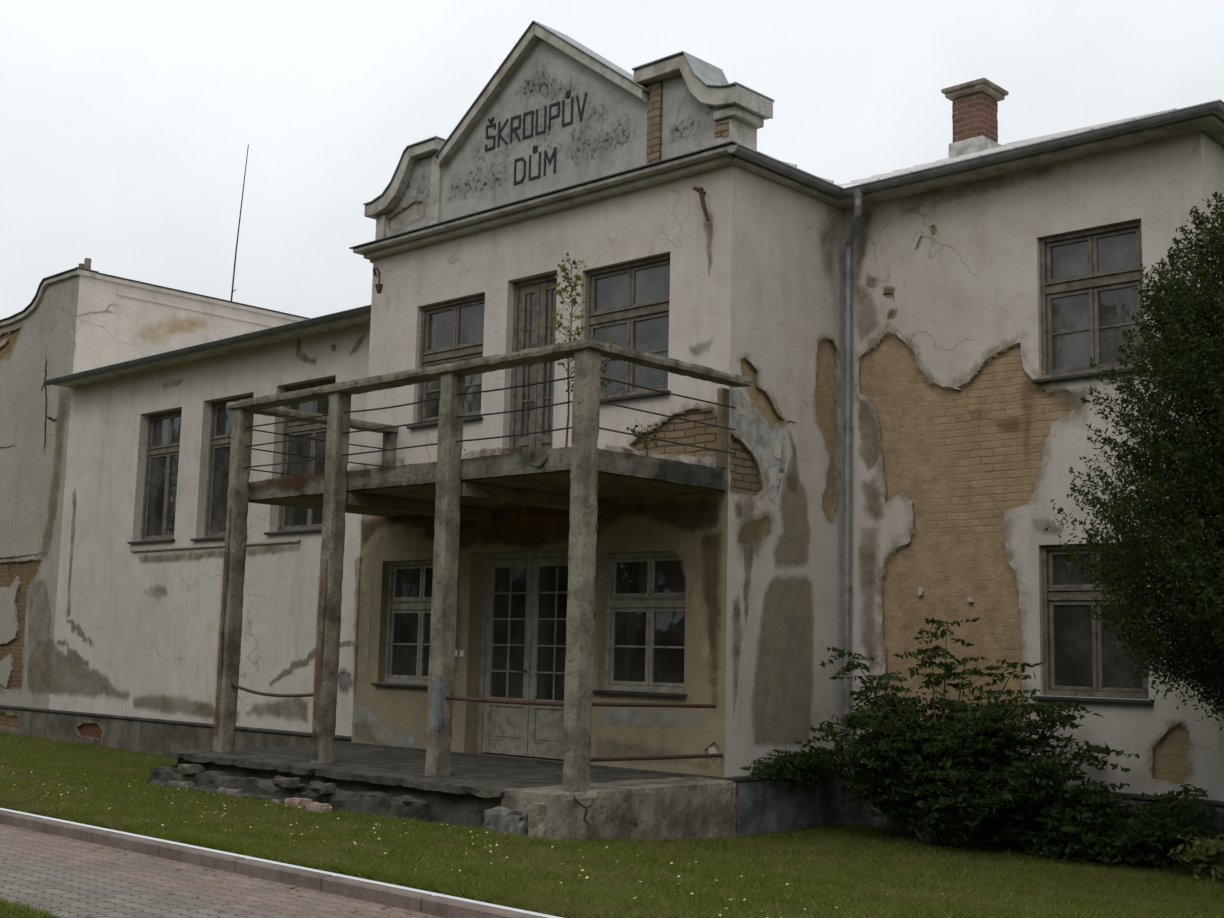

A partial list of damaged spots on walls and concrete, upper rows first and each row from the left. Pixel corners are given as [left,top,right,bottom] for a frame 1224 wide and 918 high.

spalling [0,327,22,361]
crack [41,356,57,453]
peeling [632,355,788,543]
spalling [815,336,840,521]
spalling [859,278,1081,728]
spalling [0,559,41,690]
leakage [28,627,215,717]
spalling [1152,721,1190,784]